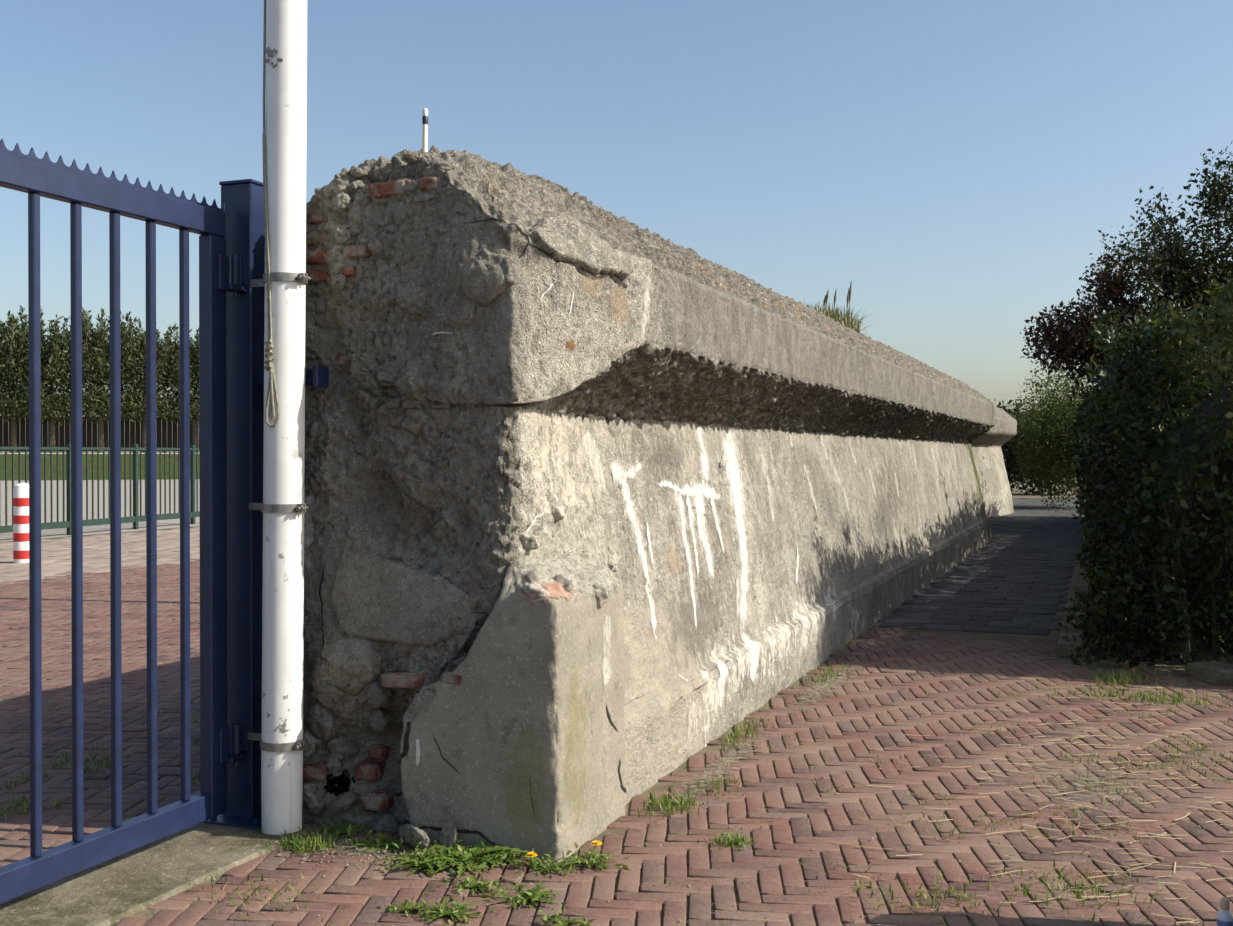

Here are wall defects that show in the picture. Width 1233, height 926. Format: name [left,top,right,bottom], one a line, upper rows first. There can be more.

spalling [306,152,452,314]
crack [464,181,628,288]
spalling [302,549,478,857]